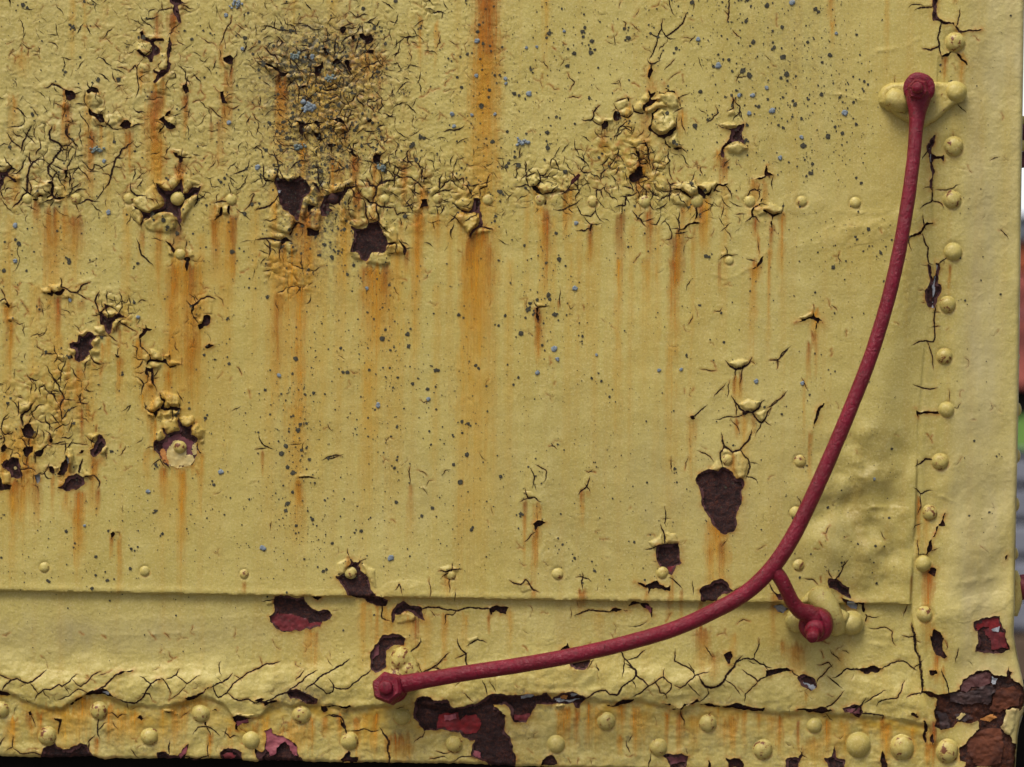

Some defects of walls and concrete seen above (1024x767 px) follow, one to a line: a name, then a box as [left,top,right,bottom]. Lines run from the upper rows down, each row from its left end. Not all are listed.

corrosion [478,0,497,114]
crack [0,0,784,502]
crack [908,188,943,250]
peeling [41,278,205,468]
peeling [695,430,758,546]
crack [0,628,473,763]
peeling [262,595,332,632]
peeling [336,549,425,673]
peeling [413,689,634,766]
crack [571,571,769,756]
crack [789,604,986,739]
peeling [922,668,1024,767]